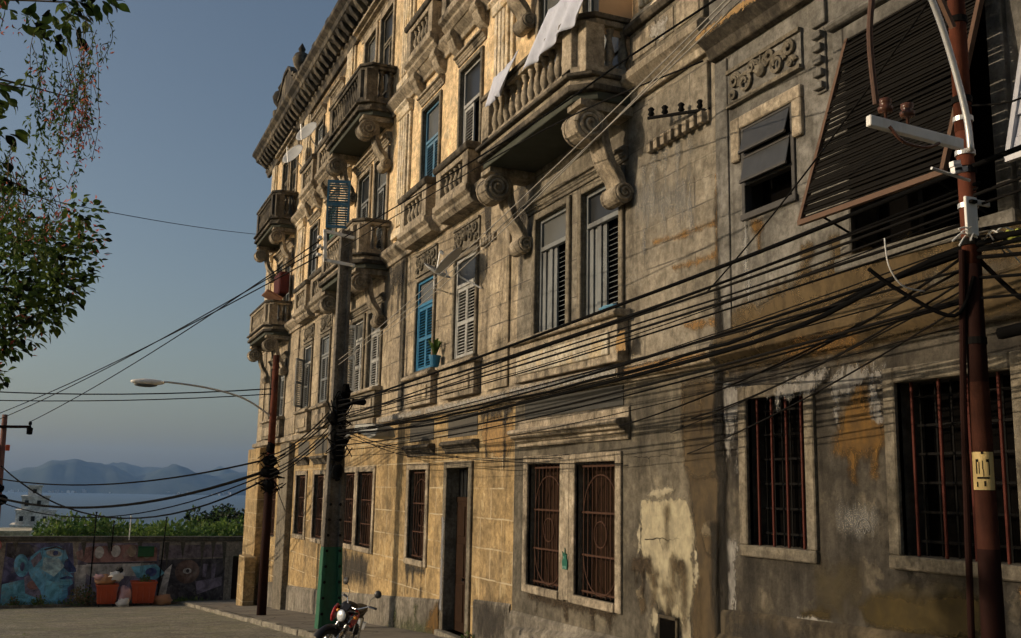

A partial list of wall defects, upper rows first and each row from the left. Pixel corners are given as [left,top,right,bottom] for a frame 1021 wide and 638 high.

leakage [982,225,1021,317]
peeling [722,382,748,468]
leakage [652,196,959,638]
peeling [636,486,711,638]